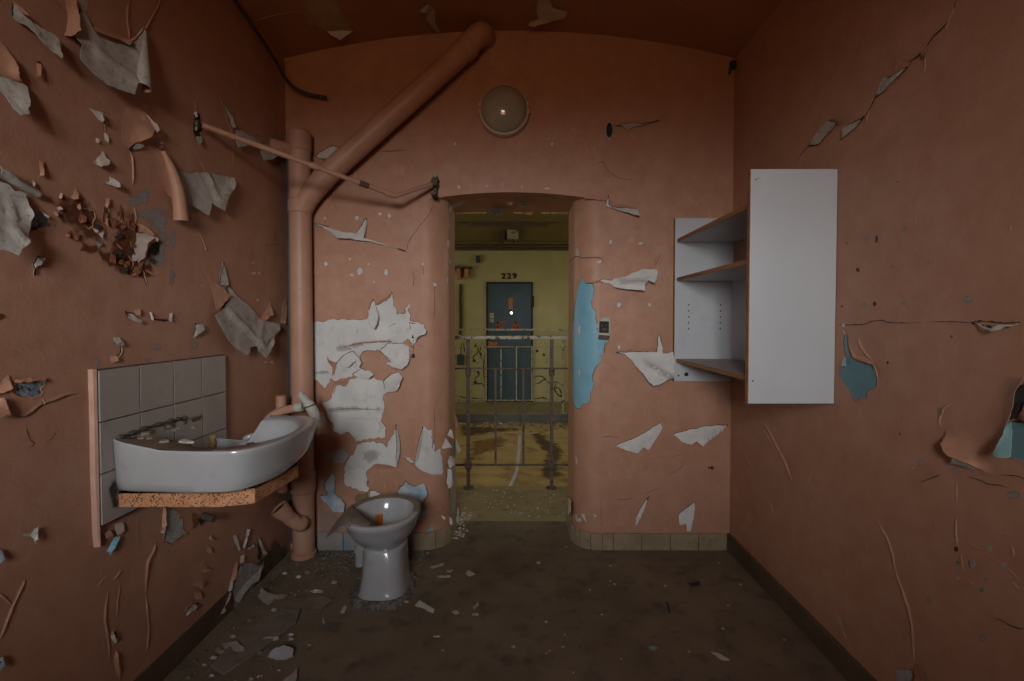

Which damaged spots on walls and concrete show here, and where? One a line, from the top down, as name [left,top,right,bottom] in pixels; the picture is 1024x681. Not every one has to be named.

crack [837,0,959,143]
peeling [0,0,277,288]
peeling [201,262,287,363]
flaking render [313,292,461,534]
peeling [571,257,675,410]
peeling [616,422,728,453]
peeling [837,330,889,404]
crack [838,320,1024,331]
peeling [937,377,1024,474]
peeling [636,497,649,525]
peeling [679,501,696,531]